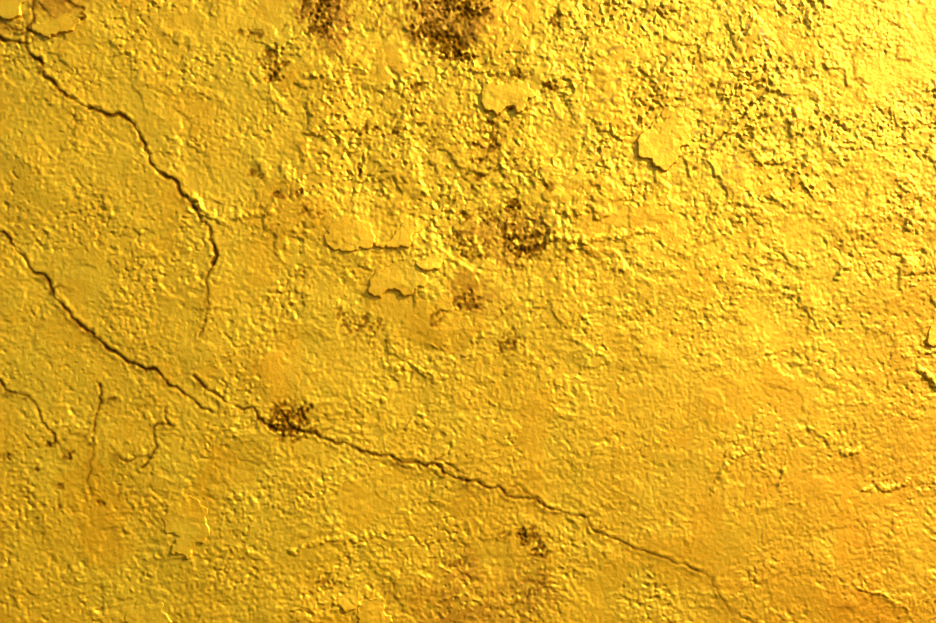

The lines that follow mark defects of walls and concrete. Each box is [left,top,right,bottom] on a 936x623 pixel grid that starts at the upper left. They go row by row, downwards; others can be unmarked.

crack [0,0,218,334]
peeling [324,214,447,299]
crack [0,380,56,443]
crack [30,269,696,571]